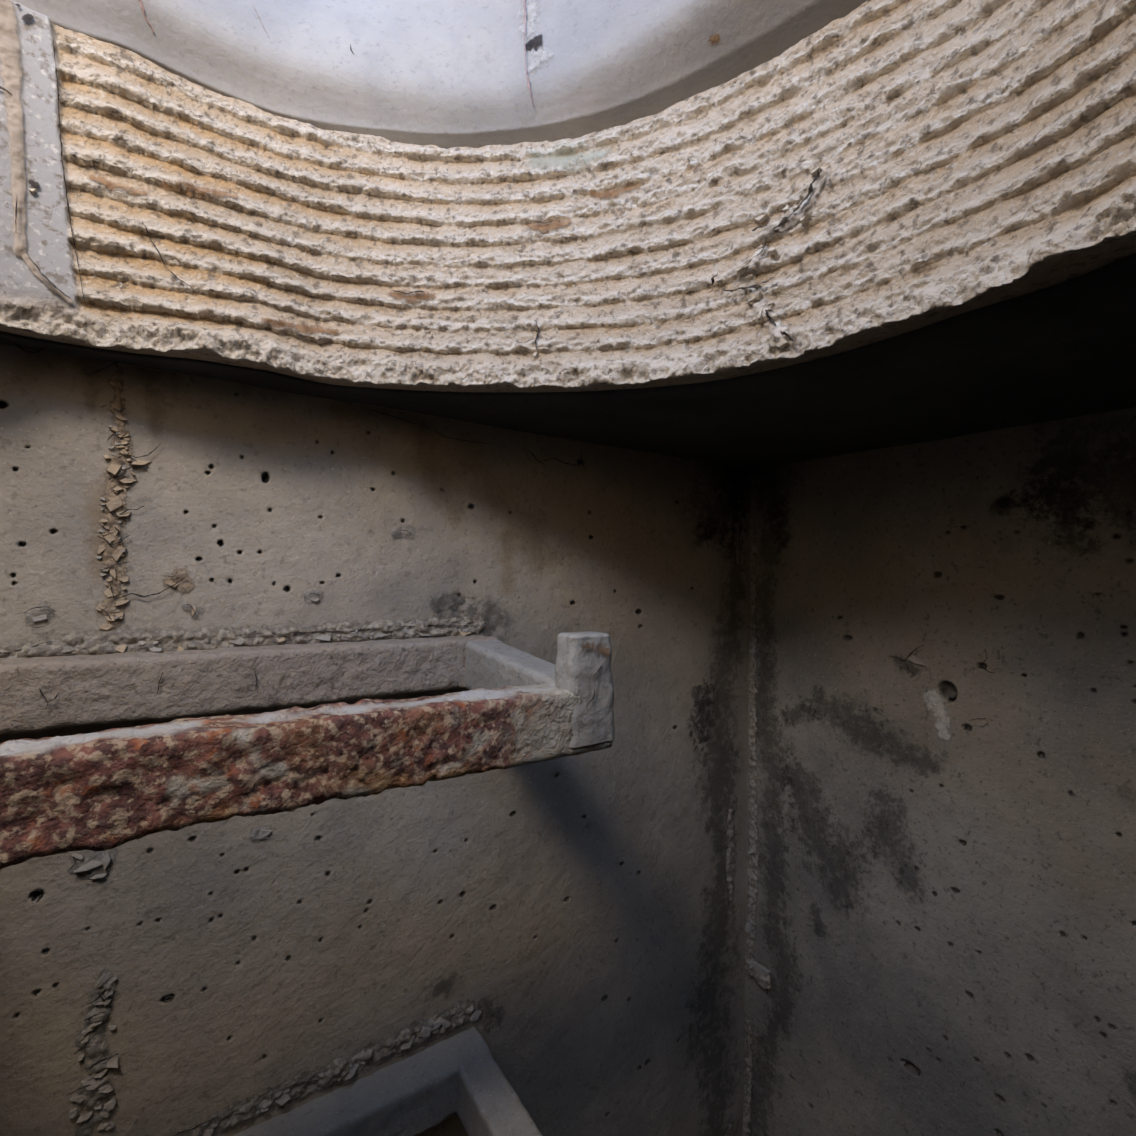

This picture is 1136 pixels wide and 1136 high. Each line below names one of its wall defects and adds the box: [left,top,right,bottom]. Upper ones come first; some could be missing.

crack [711,167,828,349]
spalling [89,361,199,632]
damp [923,690,952,740]
spalling [65,848,117,880]
spalling [67,966,119,1136]